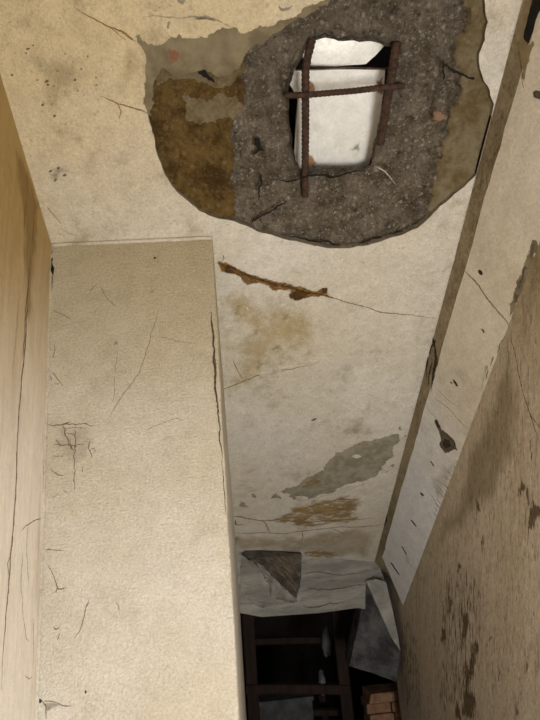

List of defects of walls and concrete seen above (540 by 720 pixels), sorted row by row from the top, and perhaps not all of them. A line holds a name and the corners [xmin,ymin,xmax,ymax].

spalling [135,0,491,246]
rust [218,256,336,301]
crack [329,296,427,318]
peeling [510,240,538,316]
crack [43,422,96,497]
crack [211,312,259,508]
peeling [271,426,406,502]
peeling [435,419,457,453]
crack [244,520,382,541]